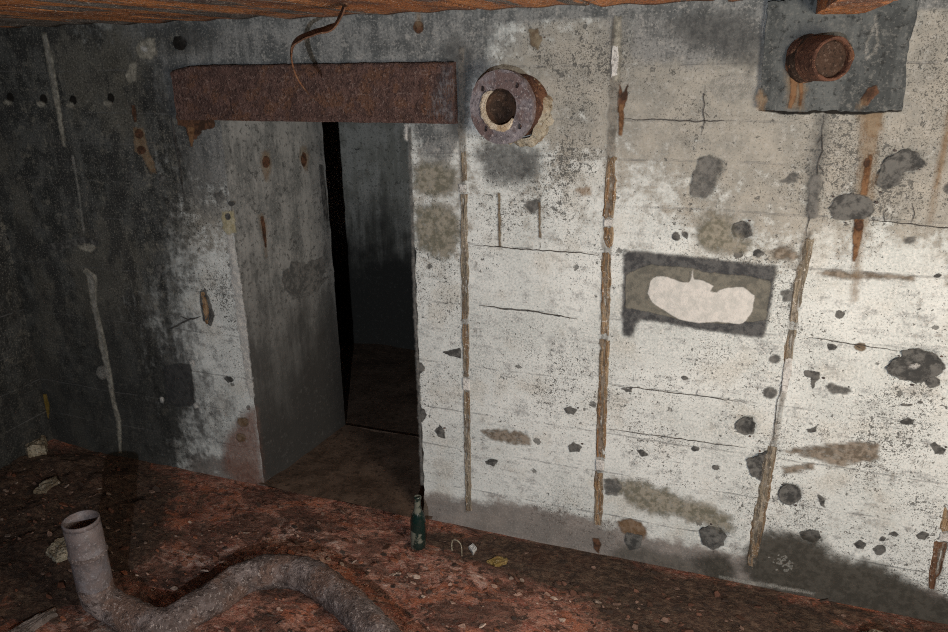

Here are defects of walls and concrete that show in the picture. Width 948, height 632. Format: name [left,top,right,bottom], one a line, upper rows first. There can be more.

damp [42,33,66,147]
damp [125,38,157,82]
corrosion [786,33,816,108]
damp [222,211,254,397]
damp [83,268,122,453]
spalling [886,348,946,388]
damp [614,531,948,624]